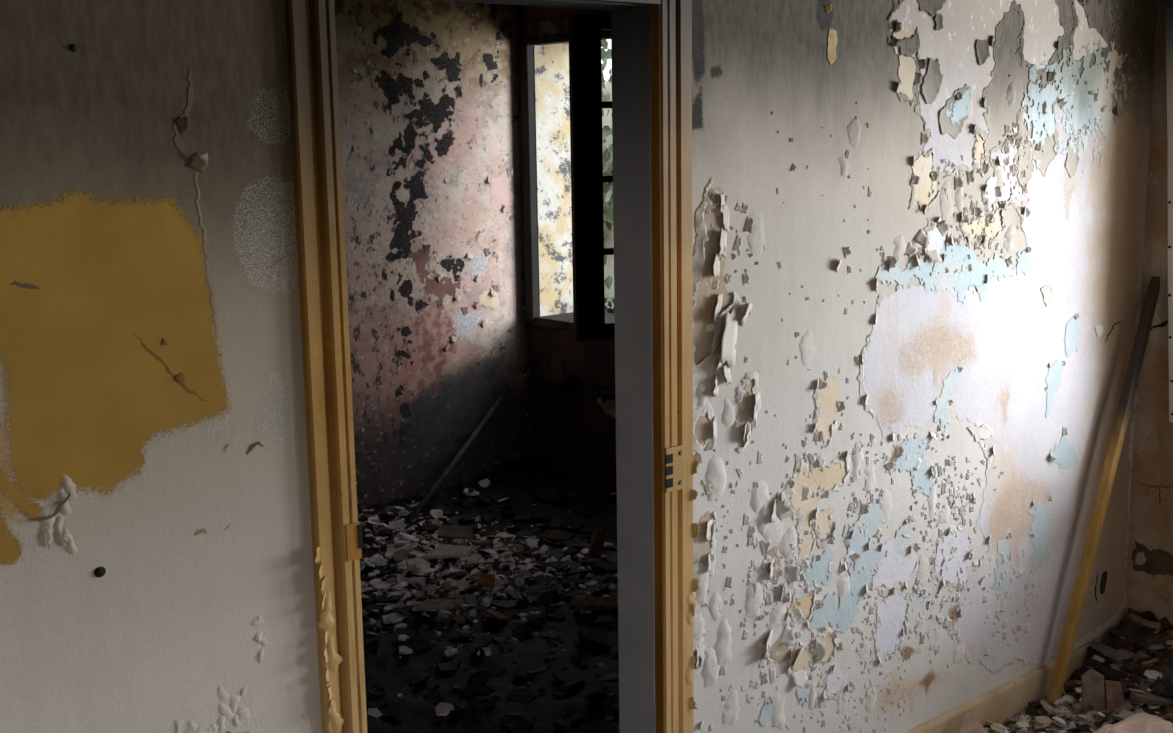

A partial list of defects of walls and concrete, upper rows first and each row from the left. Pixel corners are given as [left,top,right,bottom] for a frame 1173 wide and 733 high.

peeling [487,169,516,213]
peeling [401,244,501,396]
peeling [685,0,1173,733]